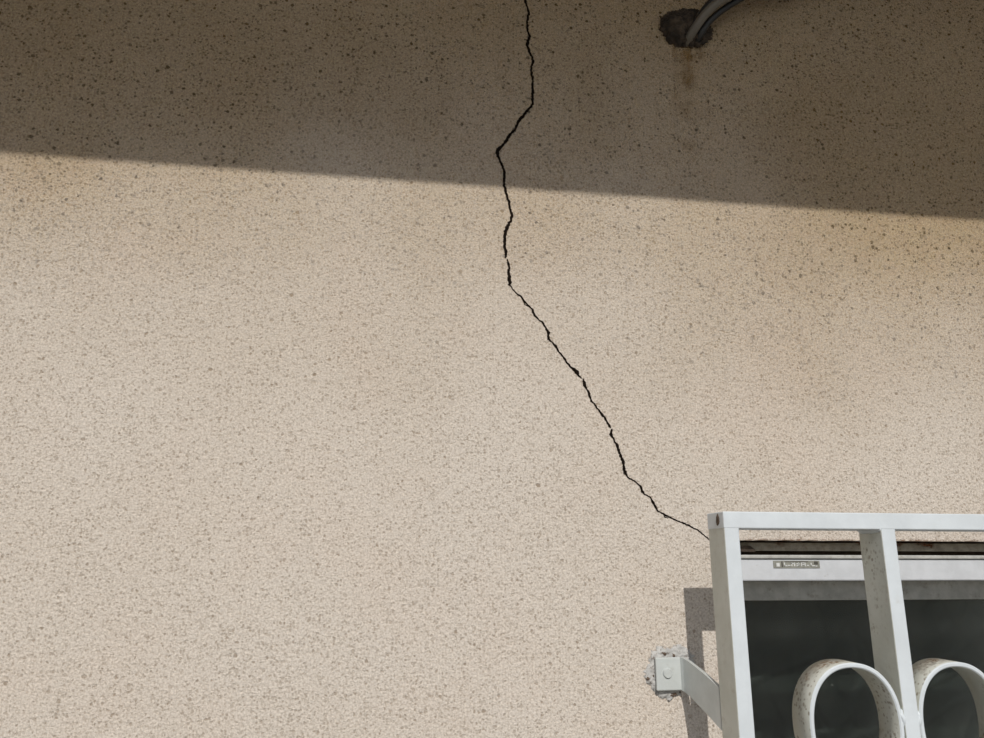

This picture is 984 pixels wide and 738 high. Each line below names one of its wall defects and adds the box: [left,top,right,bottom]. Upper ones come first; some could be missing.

crack [495,0,709,540]